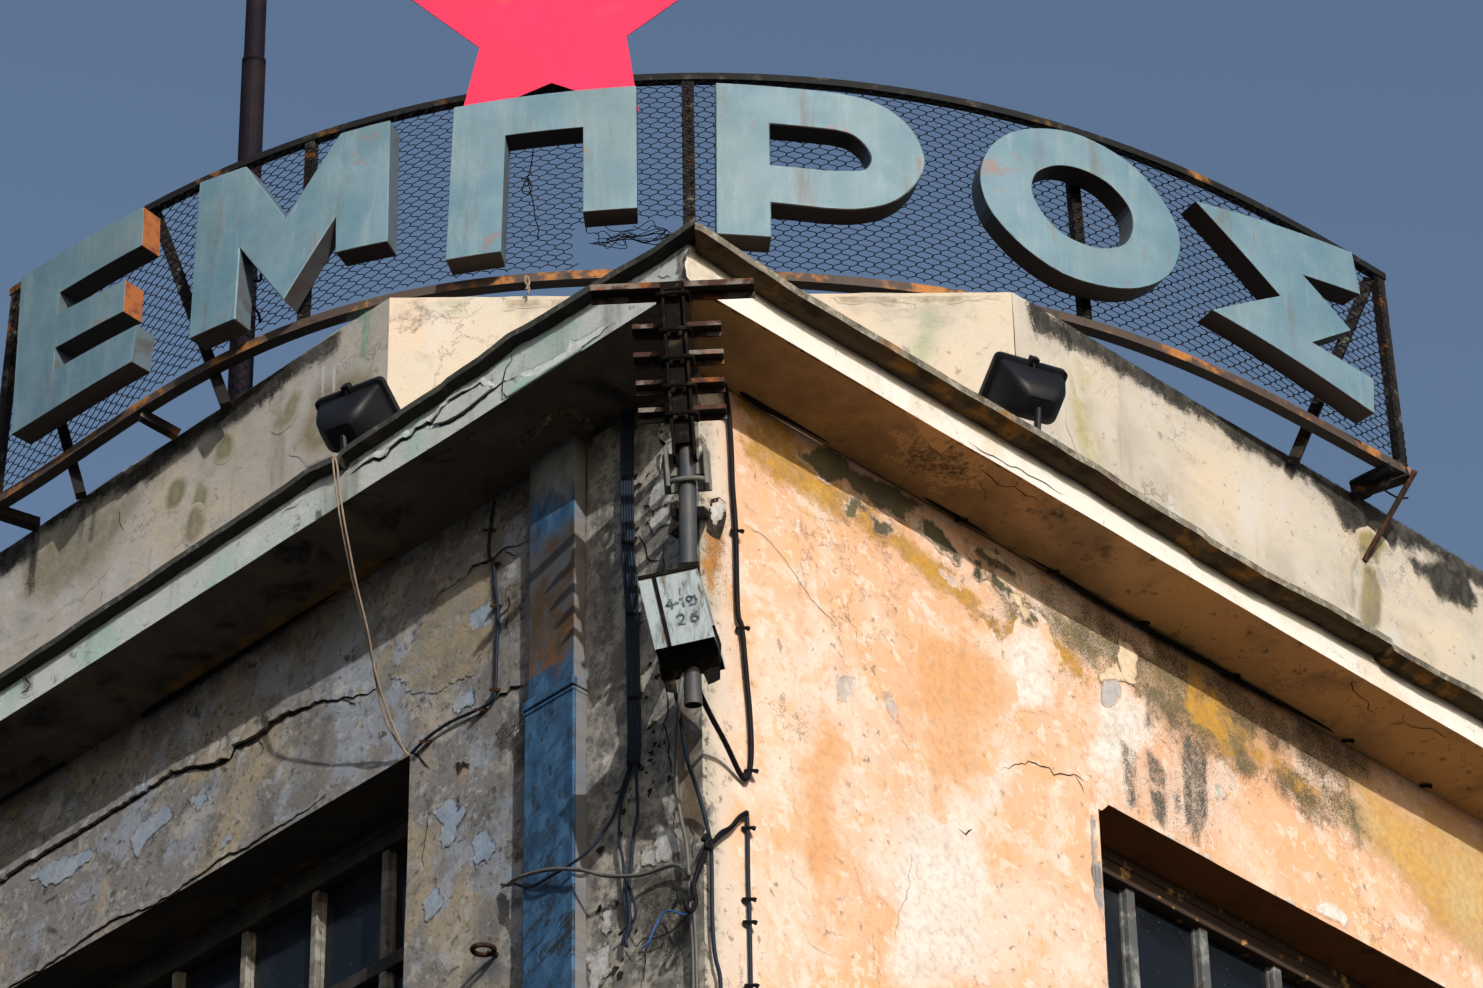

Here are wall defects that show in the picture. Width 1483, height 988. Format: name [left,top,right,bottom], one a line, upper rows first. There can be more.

water stain [0,672,74,747]
water stain [0,309,377,662]
crack [0,535,528,884]
crack [351,351,518,474]
peeling [731,394,1043,988]
water stain [691,295,1379,852]
peeling [1053,637,1138,707]
water stain [1025,300,1483,615]
crack [0,791,326,988]
spalling [1090,814,1105,923]
spalling [1156,825,1215,862]
spalling [1284,895,1349,928]